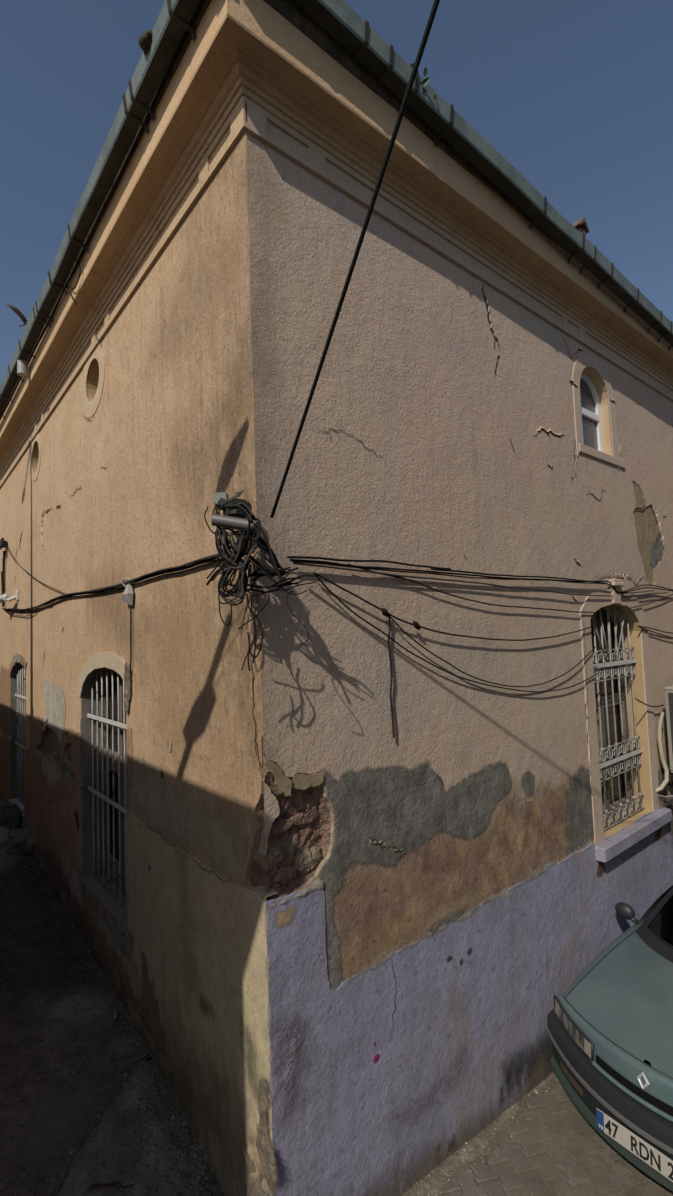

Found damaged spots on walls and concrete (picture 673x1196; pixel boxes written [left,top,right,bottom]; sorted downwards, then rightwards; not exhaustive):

crack [482,283,501,350]
crack [319,428,382,457]
crack [509,426,607,501]
crack [14,466,107,583]
spalling [632,481,665,585]
peeling [28,716,82,782]
crack [250,655,261,772]
peeling [246,747,569,980]
peeling [242,1139,261,1180]
damp [366,1057,554,1196]